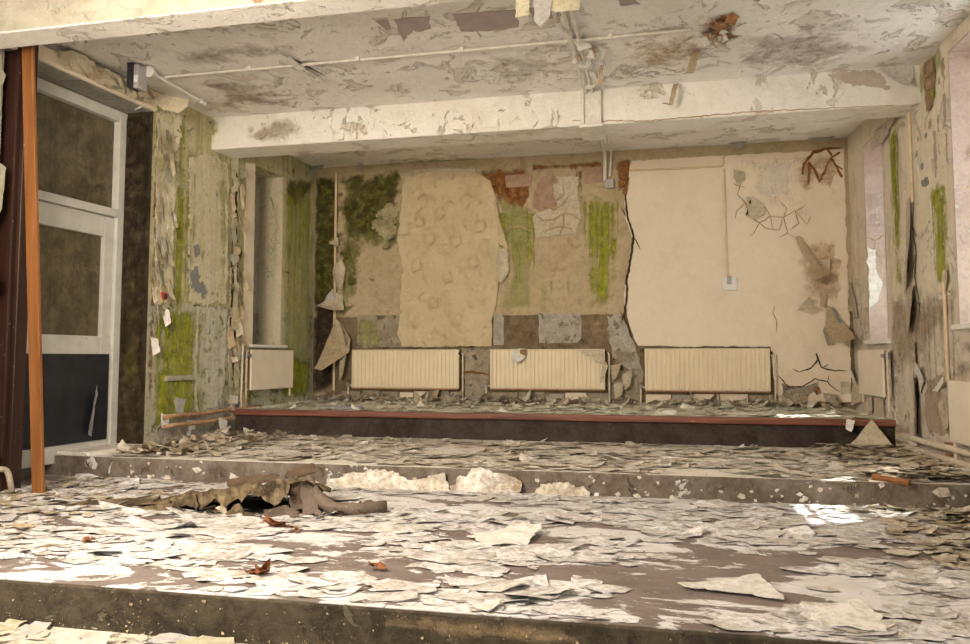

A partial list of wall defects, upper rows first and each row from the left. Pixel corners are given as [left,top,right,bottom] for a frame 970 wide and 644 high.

peeling [375,16,431,41]
corrosion [700,12,740,50]
crack [573,105,892,122]
corrosion [483,162,601,206]
crack [735,147,843,238]
leakage [889,135,899,234]
leakage [116,114,149,444]
leakage [287,171,399,391]
crack [621,194,640,338]
peeling [794,236,858,346]
spalling [866,247,883,308]
crack [778,353,844,394]